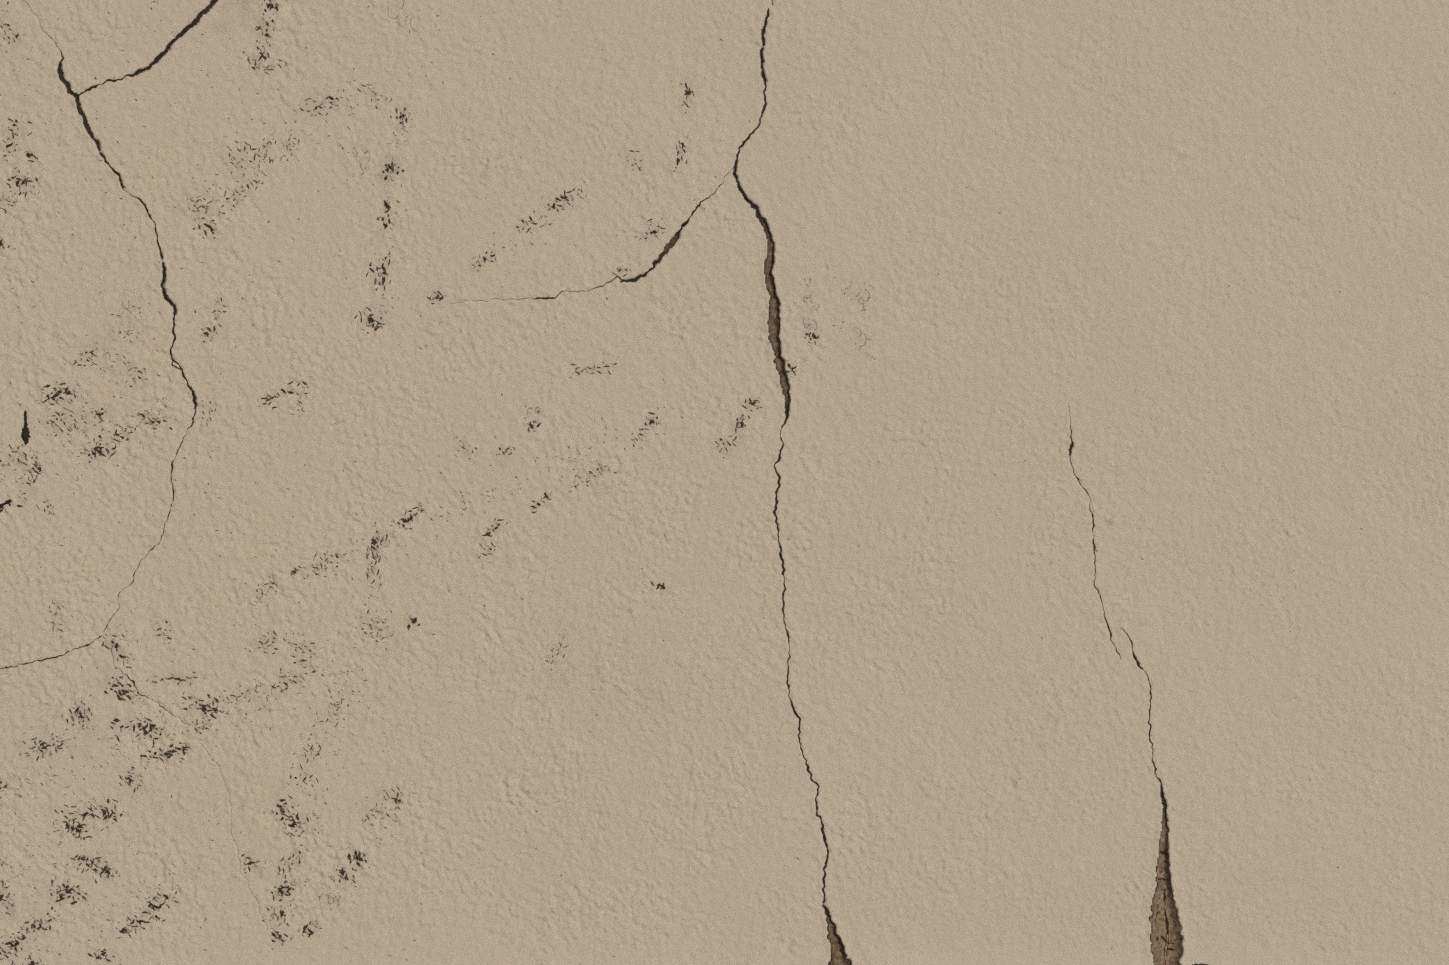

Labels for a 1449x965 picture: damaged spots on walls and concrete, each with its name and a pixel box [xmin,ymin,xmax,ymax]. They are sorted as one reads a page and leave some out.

crack [0,0,266,923]
crack [453,0,852,965]
crack [1068,402,1184,965]